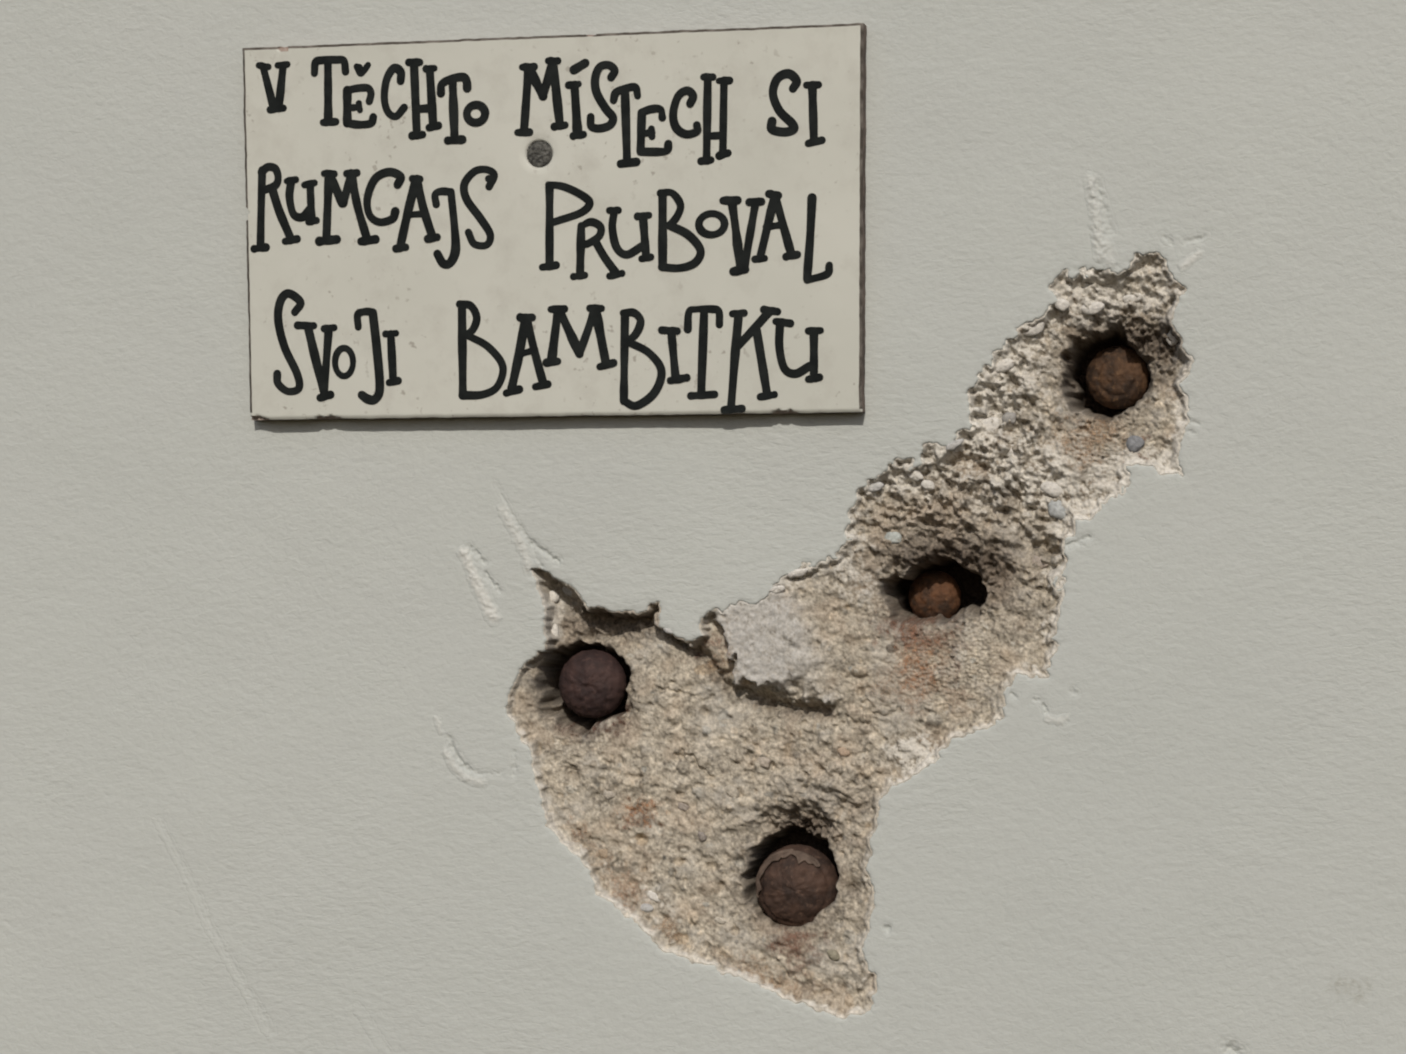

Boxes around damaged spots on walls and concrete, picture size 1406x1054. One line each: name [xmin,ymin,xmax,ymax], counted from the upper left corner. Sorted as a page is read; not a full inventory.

corrosion [755,849,820,898]
spalling [432,252,1203,1019]